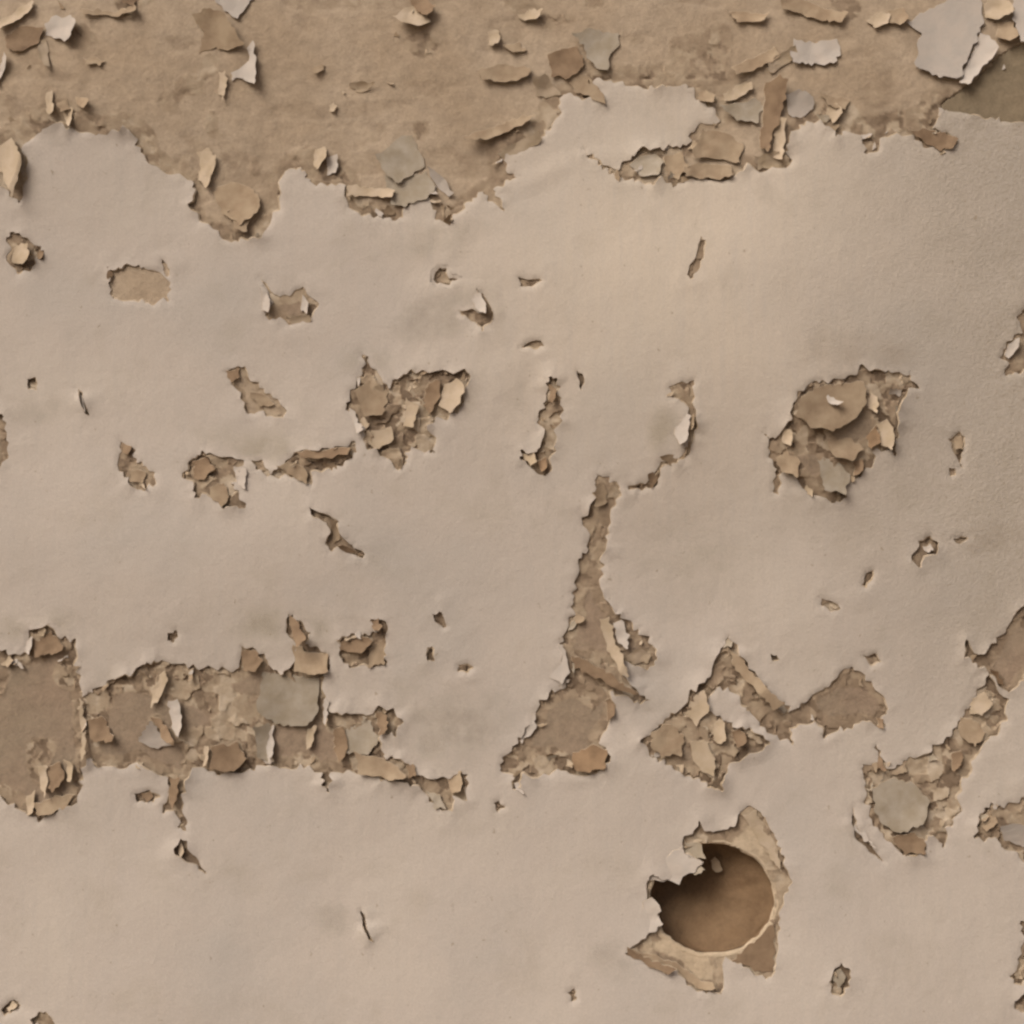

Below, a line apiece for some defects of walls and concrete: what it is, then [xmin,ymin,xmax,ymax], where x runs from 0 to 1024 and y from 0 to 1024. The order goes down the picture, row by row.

peeling [0,0,1024,242]
peeling [7,232,44,273]
peeling [258,283,319,325]
peeling [118,442,156,491]
peeling [182,355,470,508]
peeling [311,509,364,558]
peeling [500,377,697,794]
peeling [764,364,919,503]
peeling [0,615,468,873]
peeling [640,638,887,791]
peeling [853,606,1024,861]
spalling [642,809,781,972]